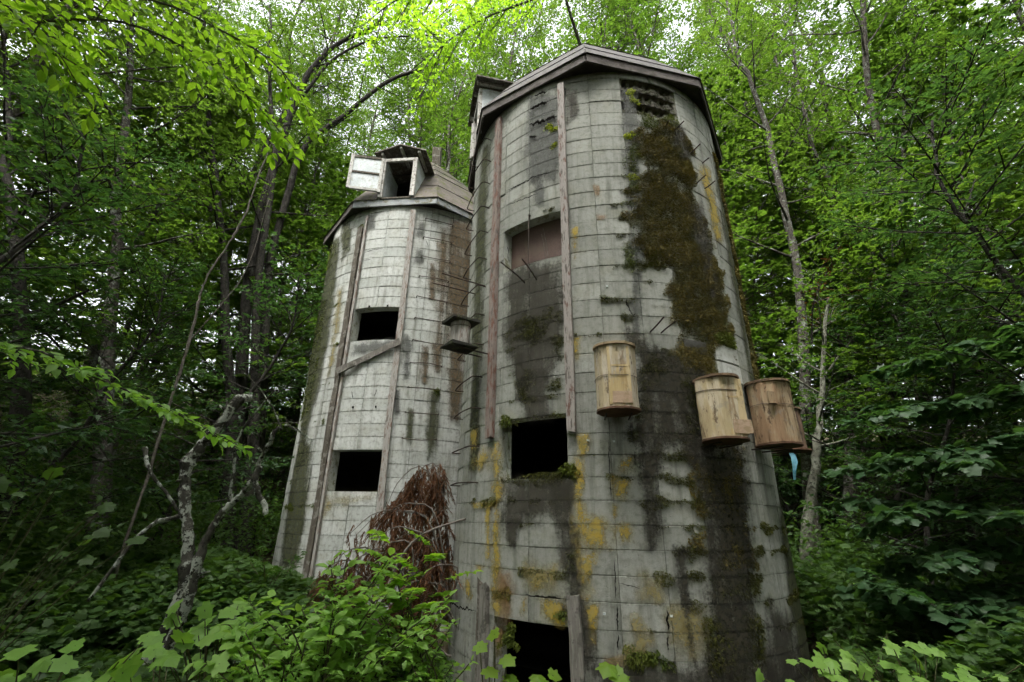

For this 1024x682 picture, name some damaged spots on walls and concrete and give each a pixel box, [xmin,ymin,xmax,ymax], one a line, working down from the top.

water stain [354,144,490,470]
water stain [526,88,579,204]
water stain [621,90,640,215]
water stain [465,230,813,682]